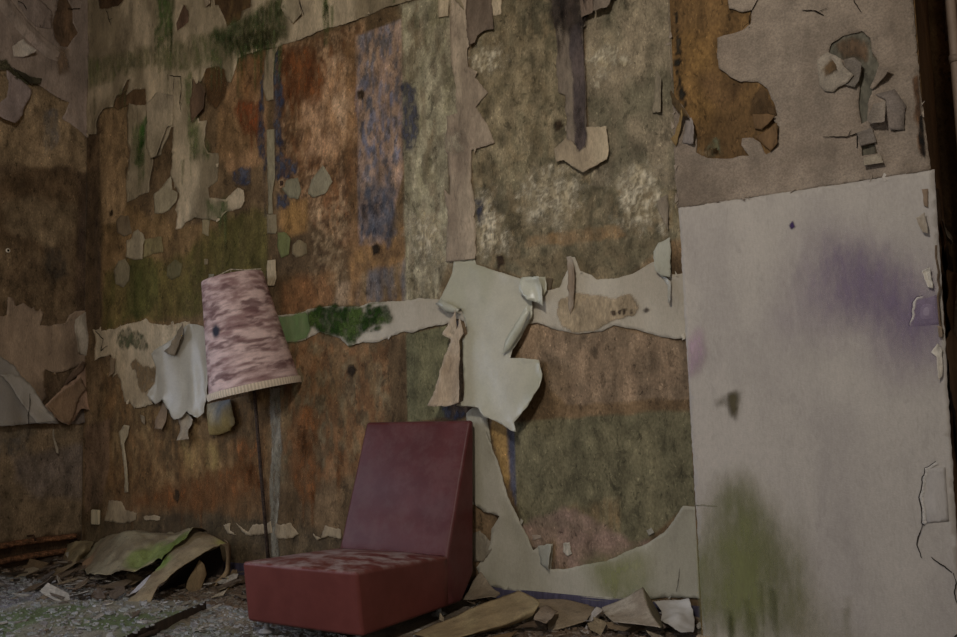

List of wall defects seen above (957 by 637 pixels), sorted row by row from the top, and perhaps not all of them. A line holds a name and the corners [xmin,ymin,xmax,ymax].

flaking render [114,84,146,110]
water stain [549,0,630,151]
peeling [652,0,931,208]
peeling [916,188,957,448]
crack [916,461,957,603]